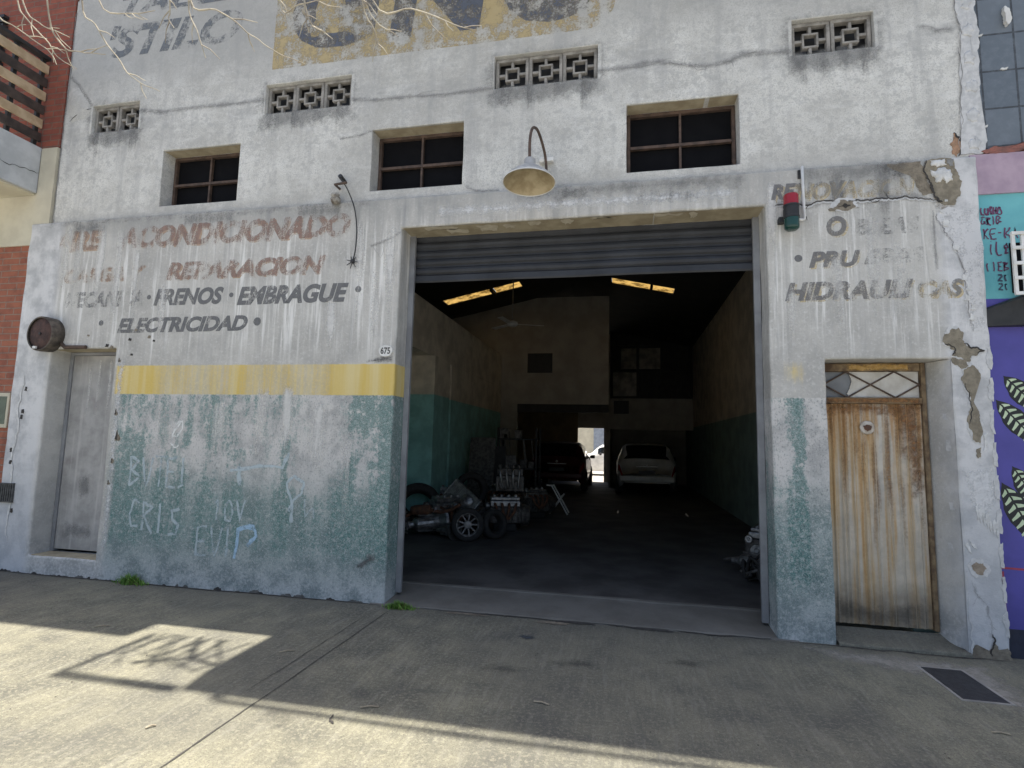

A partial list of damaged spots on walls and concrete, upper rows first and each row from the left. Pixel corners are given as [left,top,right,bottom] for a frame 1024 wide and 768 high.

crack [775,192,938,265]
peeling [885,0,1024,661]
spalling [102,344,133,547]
rust [828,398,922,498]